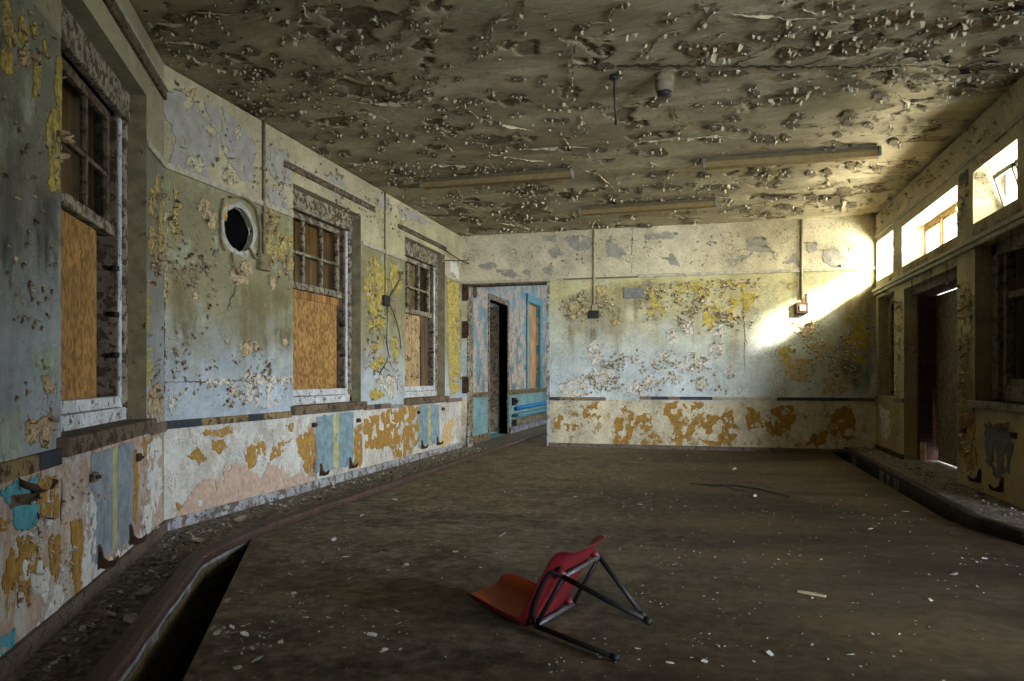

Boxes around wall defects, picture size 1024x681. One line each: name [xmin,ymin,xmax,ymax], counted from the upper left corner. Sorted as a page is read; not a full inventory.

peeling [0,0,75,194]
peeling [0,245,483,681]
peeling [141,0,1024,447]
peeling [861,267,1016,516]